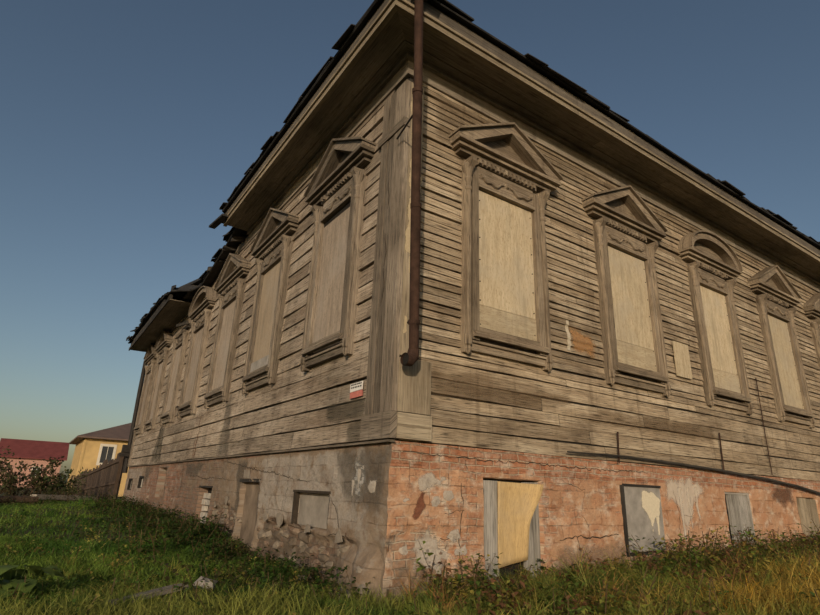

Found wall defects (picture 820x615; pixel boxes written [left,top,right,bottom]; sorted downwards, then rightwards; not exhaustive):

crack [178,460,309,509]
flaking render [250,511,354,583]
peeling [351,462,377,495]
flaking render [386,472,467,606]
crack [400,451,645,558]